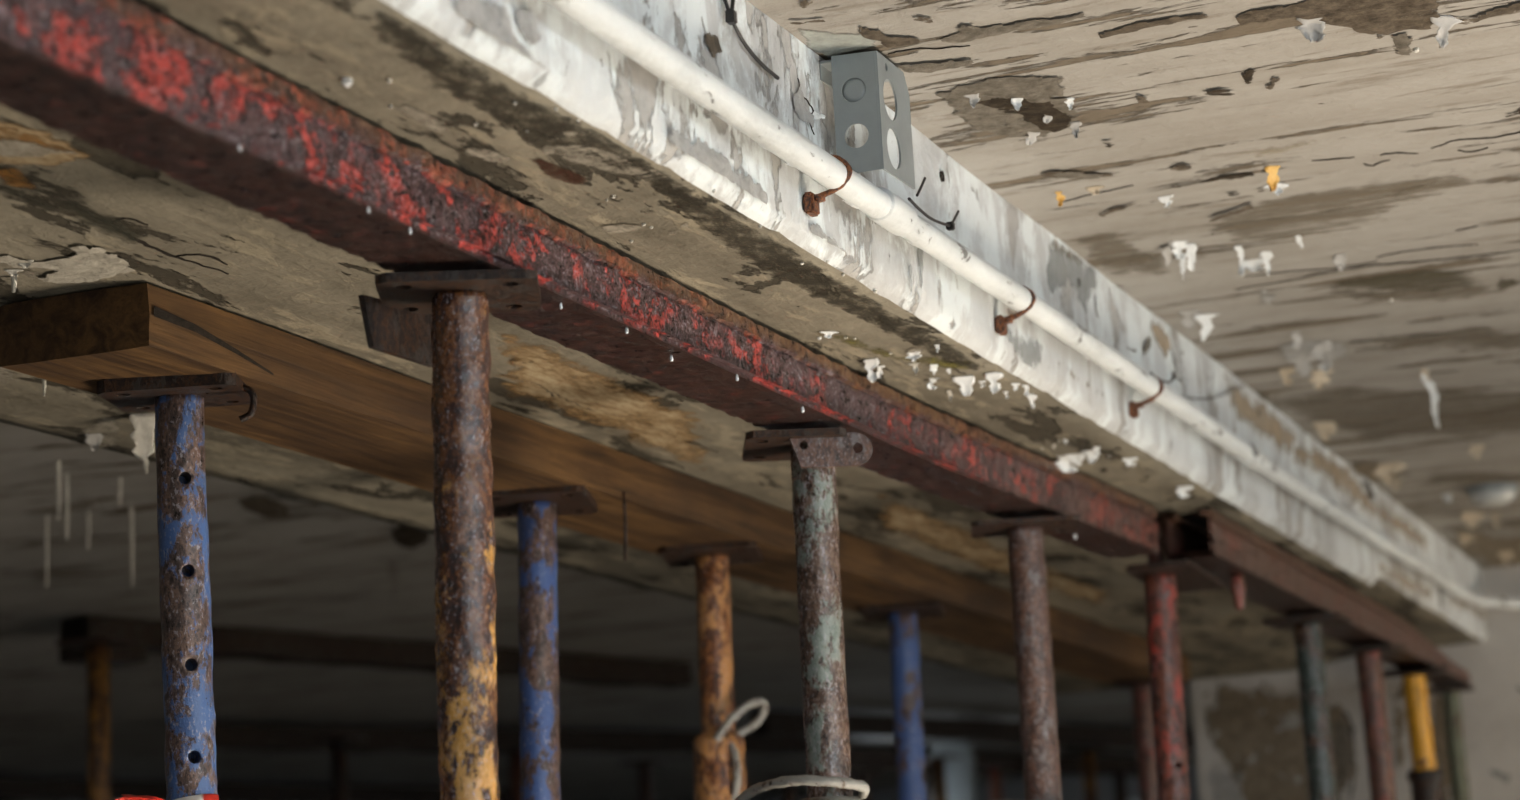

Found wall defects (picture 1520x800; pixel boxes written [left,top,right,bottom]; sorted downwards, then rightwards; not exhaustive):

spalling [705,32,722,58]
spalling [859,13,1085,73]
spalling [1099,14,1208,38]
spalling [1236,0,1520,55]
spalling [371,12,698,201]
spalling [935,76,1083,146]
corrosion [533,159,586,184]
peeling [669,129,768,204]
peeling [0,246,135,284]
peeling [1162,234,1198,280]
peeling [817,331,1037,408]
peeling [1041,439,1138,473]